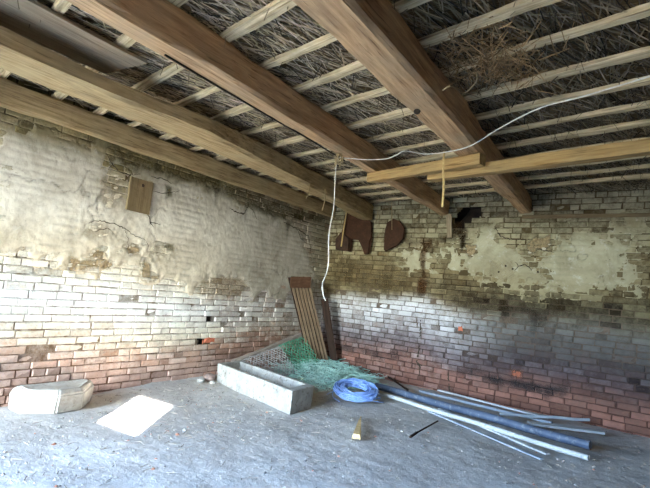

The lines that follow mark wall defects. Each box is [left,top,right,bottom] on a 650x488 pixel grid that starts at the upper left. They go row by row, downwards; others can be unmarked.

peeling [104,175,121,208]
crack [89,215,160,249]
spalling [68,250,114,271]
spalling [140,261,159,281]